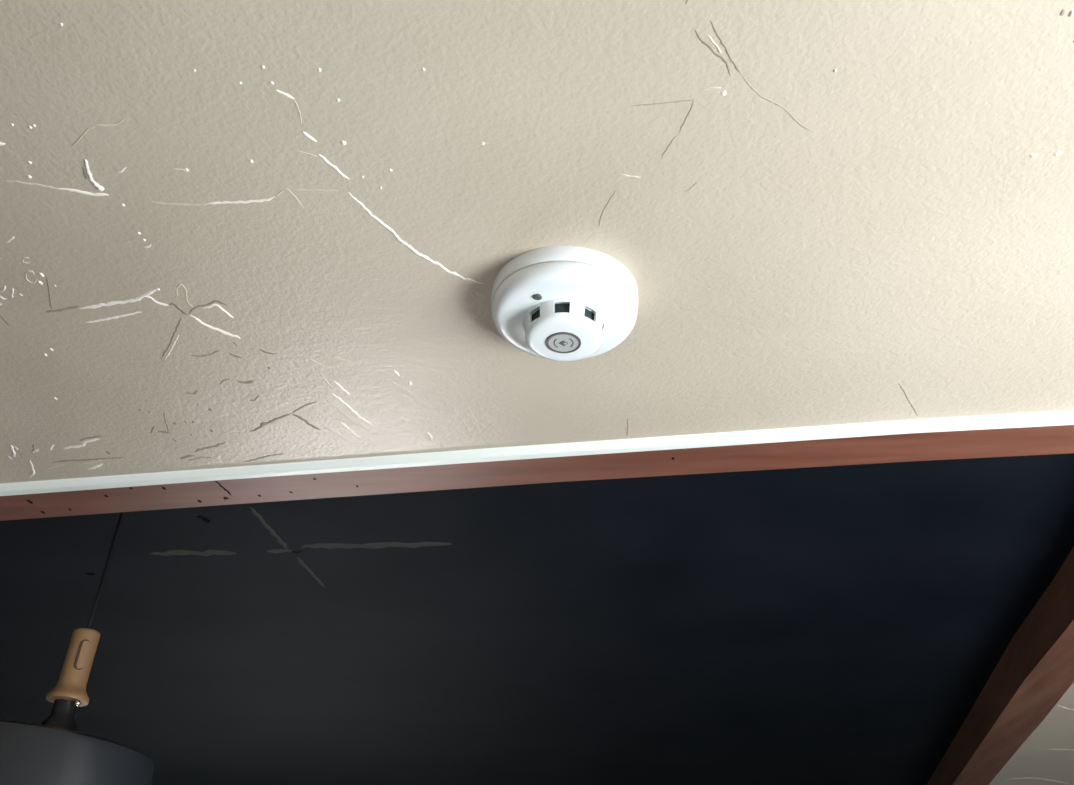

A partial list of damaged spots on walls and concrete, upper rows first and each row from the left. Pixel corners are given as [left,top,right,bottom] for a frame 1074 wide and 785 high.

crack [1059,9,1074,42]
crack [632,21,812,159]
crack [239,65,484,284]
crack [599,174,640,226]
crack [46,276,241,359]